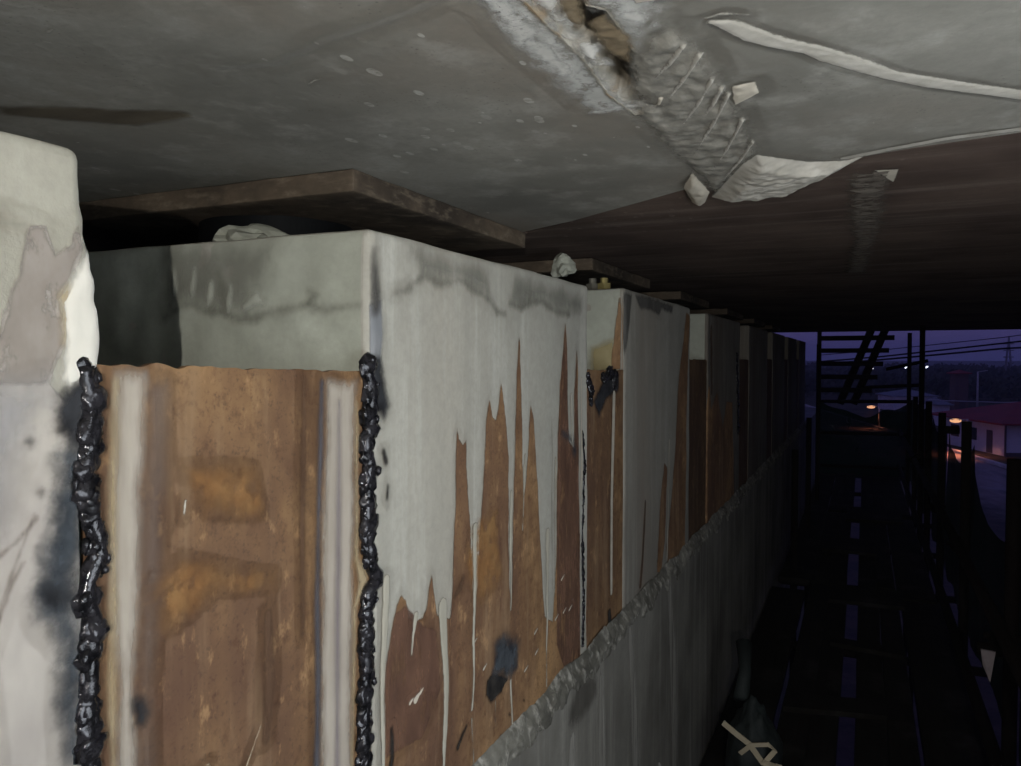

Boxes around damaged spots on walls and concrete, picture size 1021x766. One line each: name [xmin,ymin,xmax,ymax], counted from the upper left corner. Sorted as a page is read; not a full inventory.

crack [707,12,1021,100]
spalling [520,0,759,206]
crack [840,127,1021,160]
leakage [171,258,252,299]
rust [611,299,623,369]
rust [657,313,690,572]